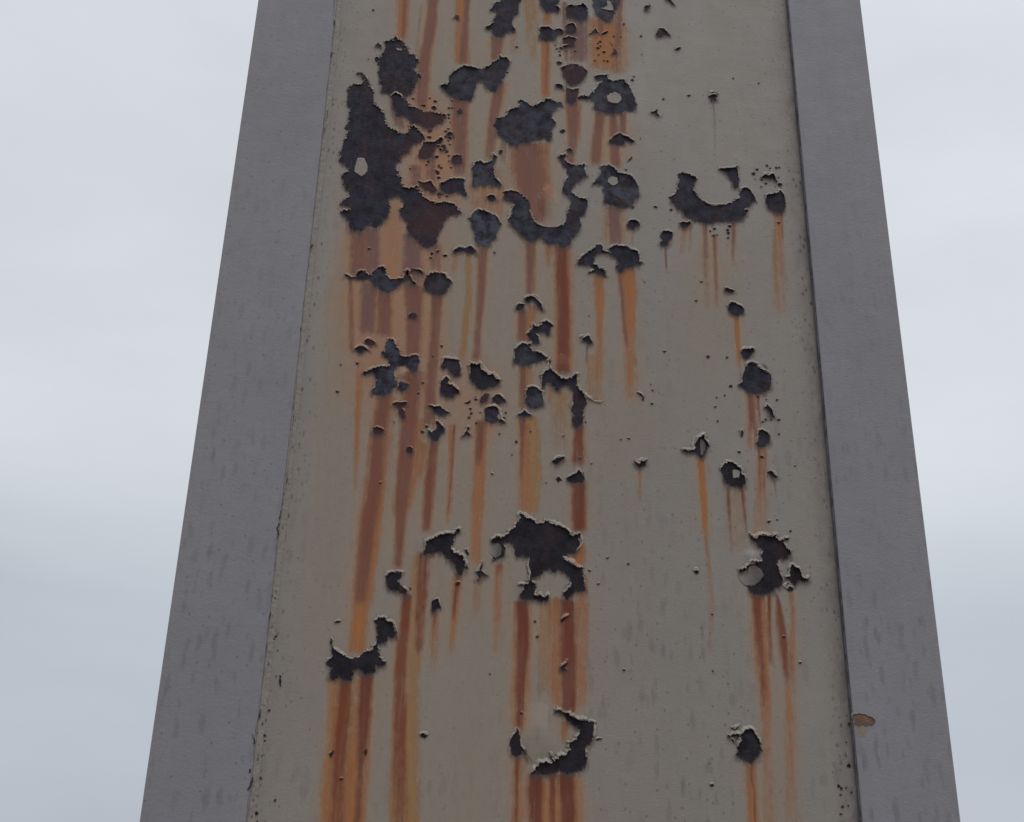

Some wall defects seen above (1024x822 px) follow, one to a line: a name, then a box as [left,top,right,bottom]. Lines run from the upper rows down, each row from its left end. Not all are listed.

peeling [338,0,645,297]
peeling [660,164,786,248]
peeling [354,294,606,442]
corrosion [517,242,571,371]
corrosion [349,98,501,822]
peeling [423,510,600,603]
peeling [737,519,810,597]
corrosion [322,674,373,822]
corrosion [512,757,582,822]
corrosion [514,580,588,739]
peeling [509,705,602,777]
corrosion [747,592,794,822]